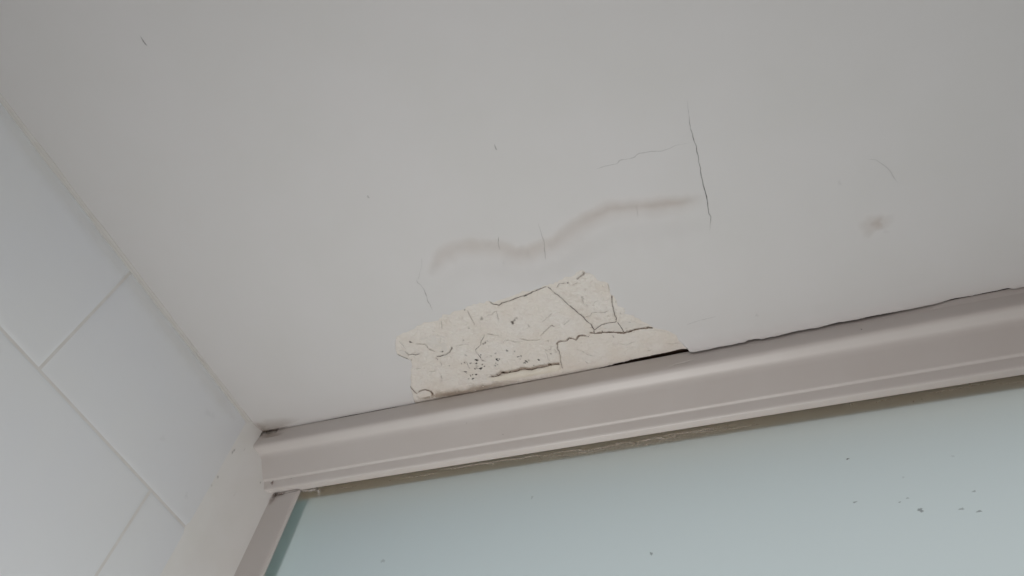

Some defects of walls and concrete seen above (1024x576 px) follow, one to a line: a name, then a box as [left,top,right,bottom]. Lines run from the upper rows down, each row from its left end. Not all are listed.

peeling [395,263,1024,403]